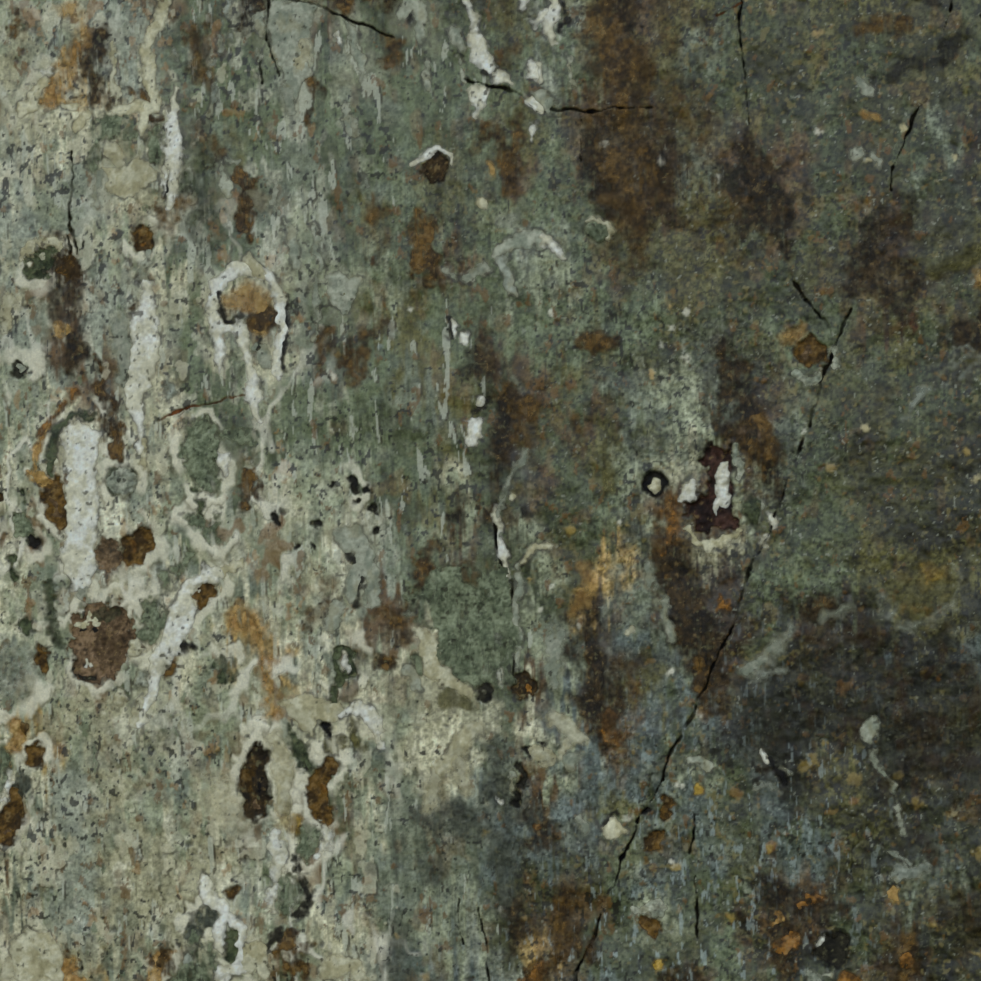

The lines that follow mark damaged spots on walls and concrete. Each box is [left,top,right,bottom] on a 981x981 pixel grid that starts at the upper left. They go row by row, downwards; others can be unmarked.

crack [329,11,394,38]
crack [465,78,513,92]
crack [792,281,852,384]
spalling [642,471,669,497]
spalling [678,442,745,555]
peeling [157,551,197,588]
crack [493,523,513,597]
spalling [16,580,168,685]
spalling [238,741,273,824]
crack [615,625,734,881]
rust [504,899,530,953]
rust [518,887,596,981]